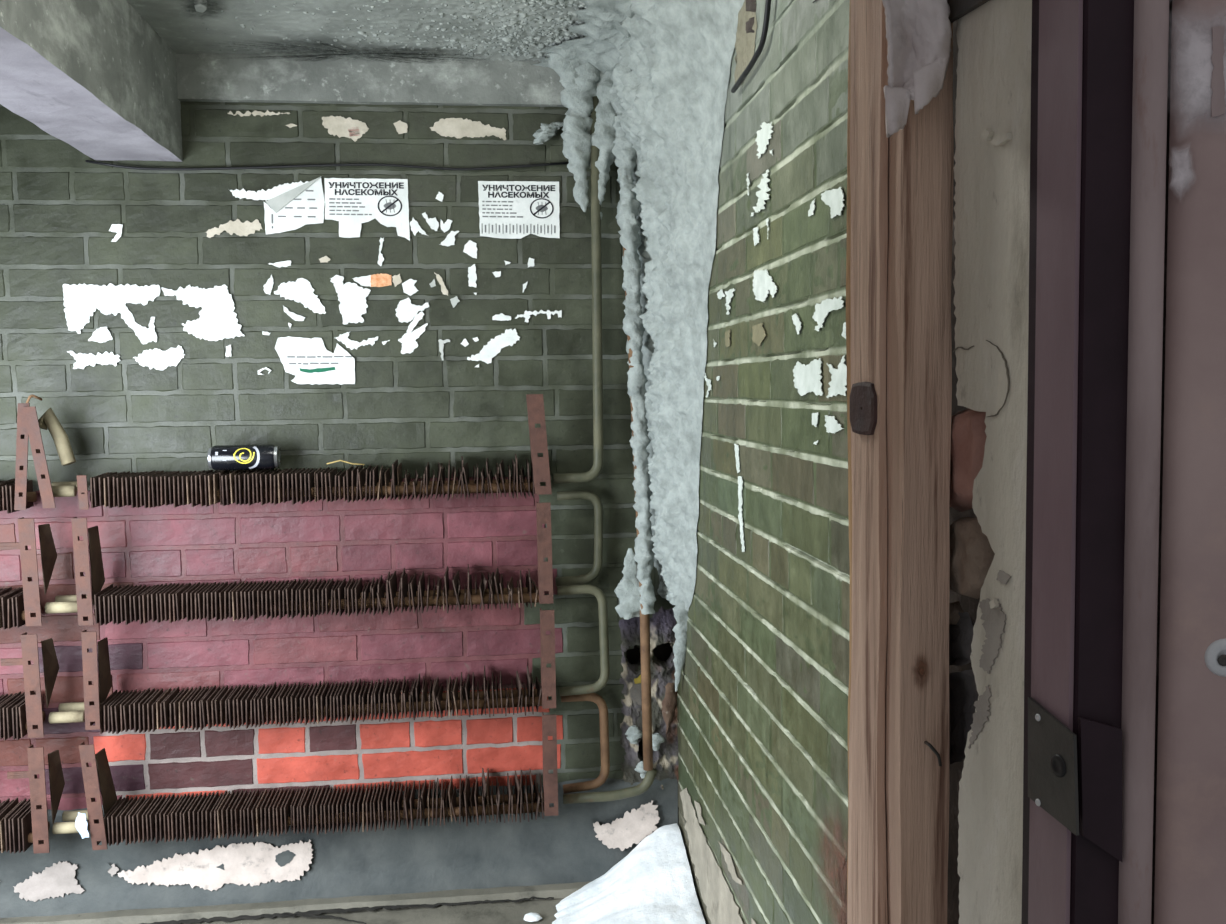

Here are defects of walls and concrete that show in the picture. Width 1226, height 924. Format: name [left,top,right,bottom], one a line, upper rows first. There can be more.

peeling [322,116,369,142]
peeling [430,118,506,140]
peeling [746,122,774,246]
peeling [808,187,845,218]
peeling [206,219,262,238]
peeling [753,270,778,302]
peeling [792,296,846,339]
peeling [793,355,847,398]
flaking render [949,408,1011,765]
spalling [593,606,756,924]
peeling [0,861,85,902]
peeling [102,839,314,891]